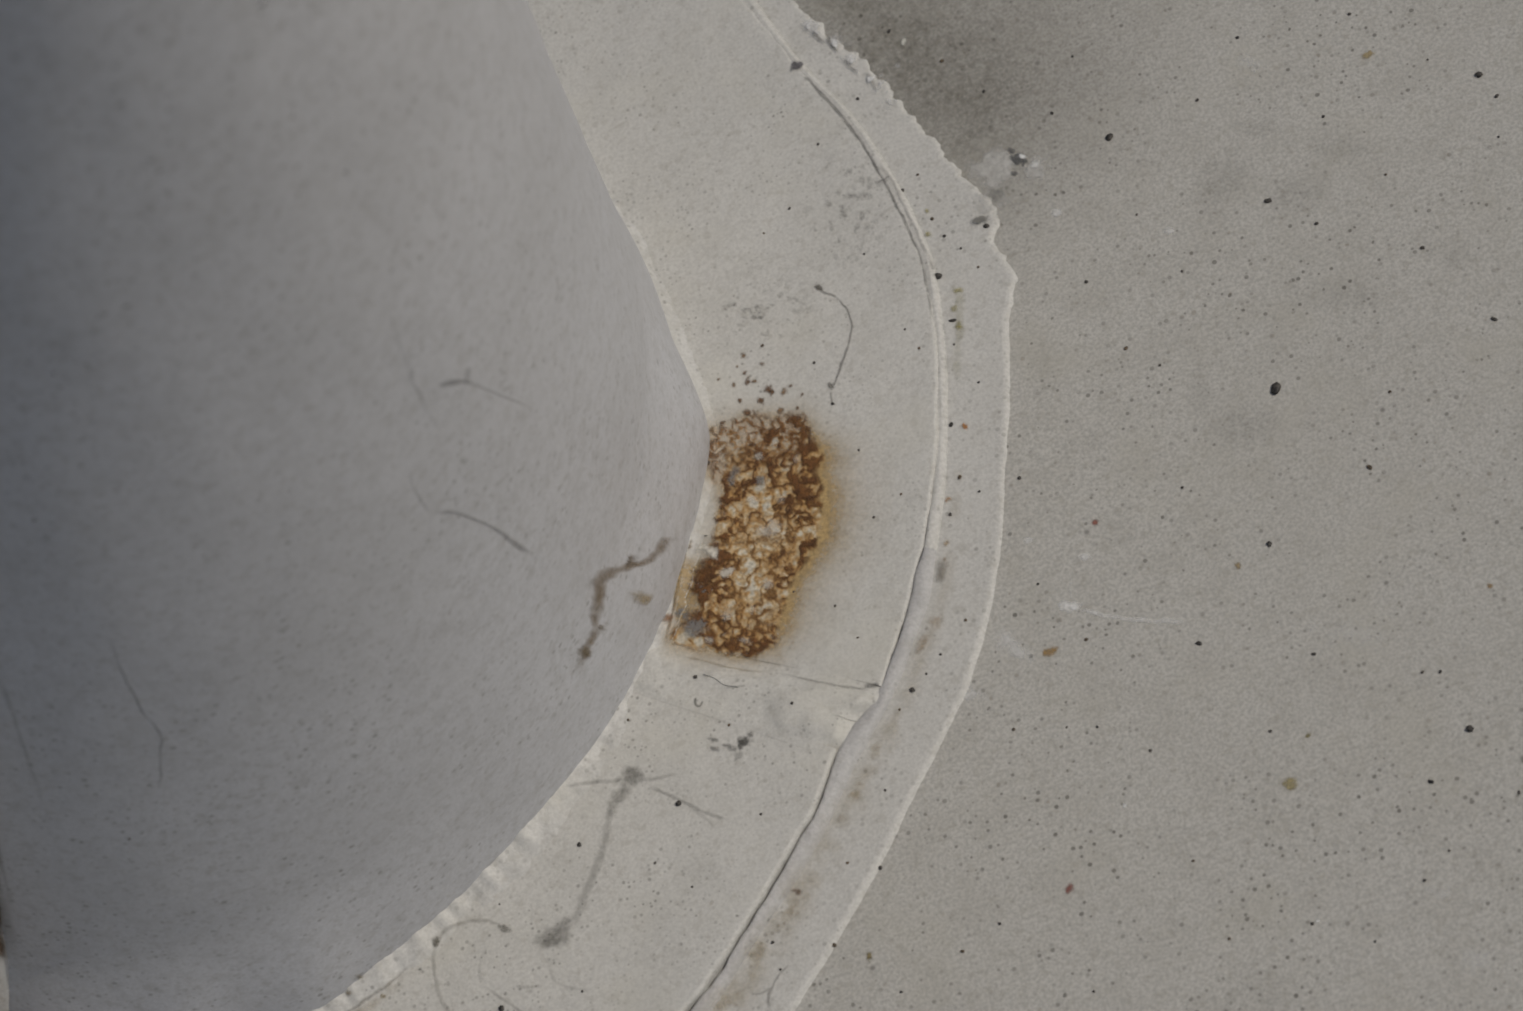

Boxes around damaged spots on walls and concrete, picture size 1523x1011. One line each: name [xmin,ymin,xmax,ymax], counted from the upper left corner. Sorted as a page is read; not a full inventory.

crack [791,61,912,236]
rust [664,354,839,658]
rust [581,575,607,656]